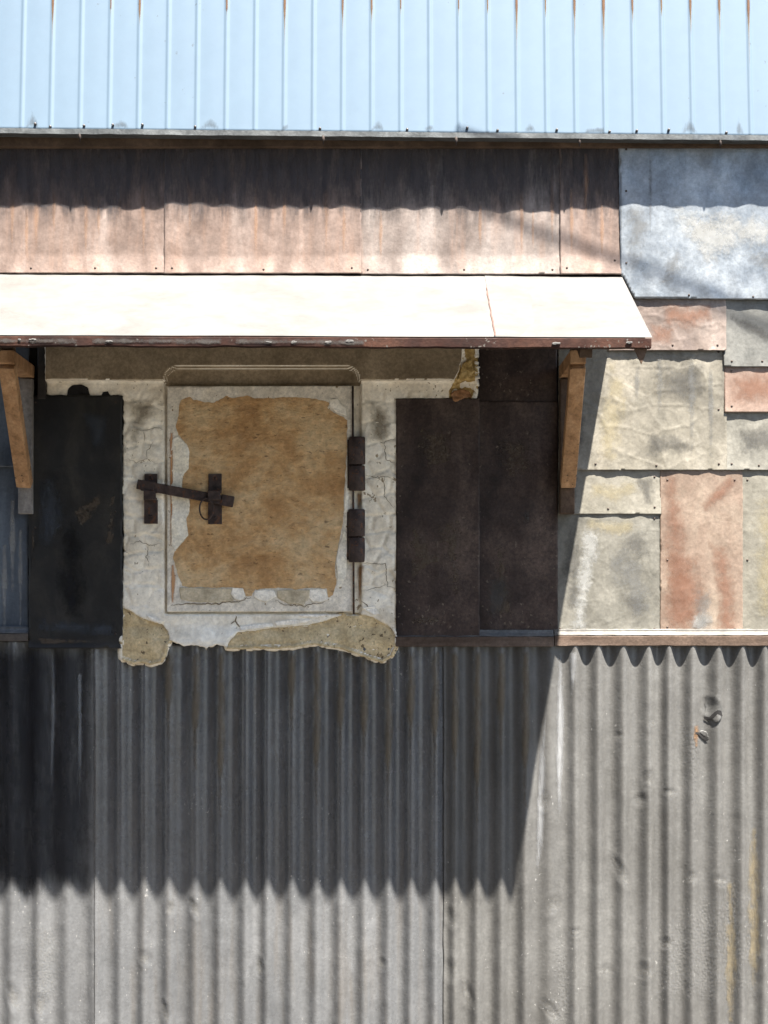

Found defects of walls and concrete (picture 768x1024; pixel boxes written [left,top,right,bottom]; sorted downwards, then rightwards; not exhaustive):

spalling [449,349,478,402]
crack [371,439,394,507]
peeling [170,396,398,663]
spalling [120,608,172,665]